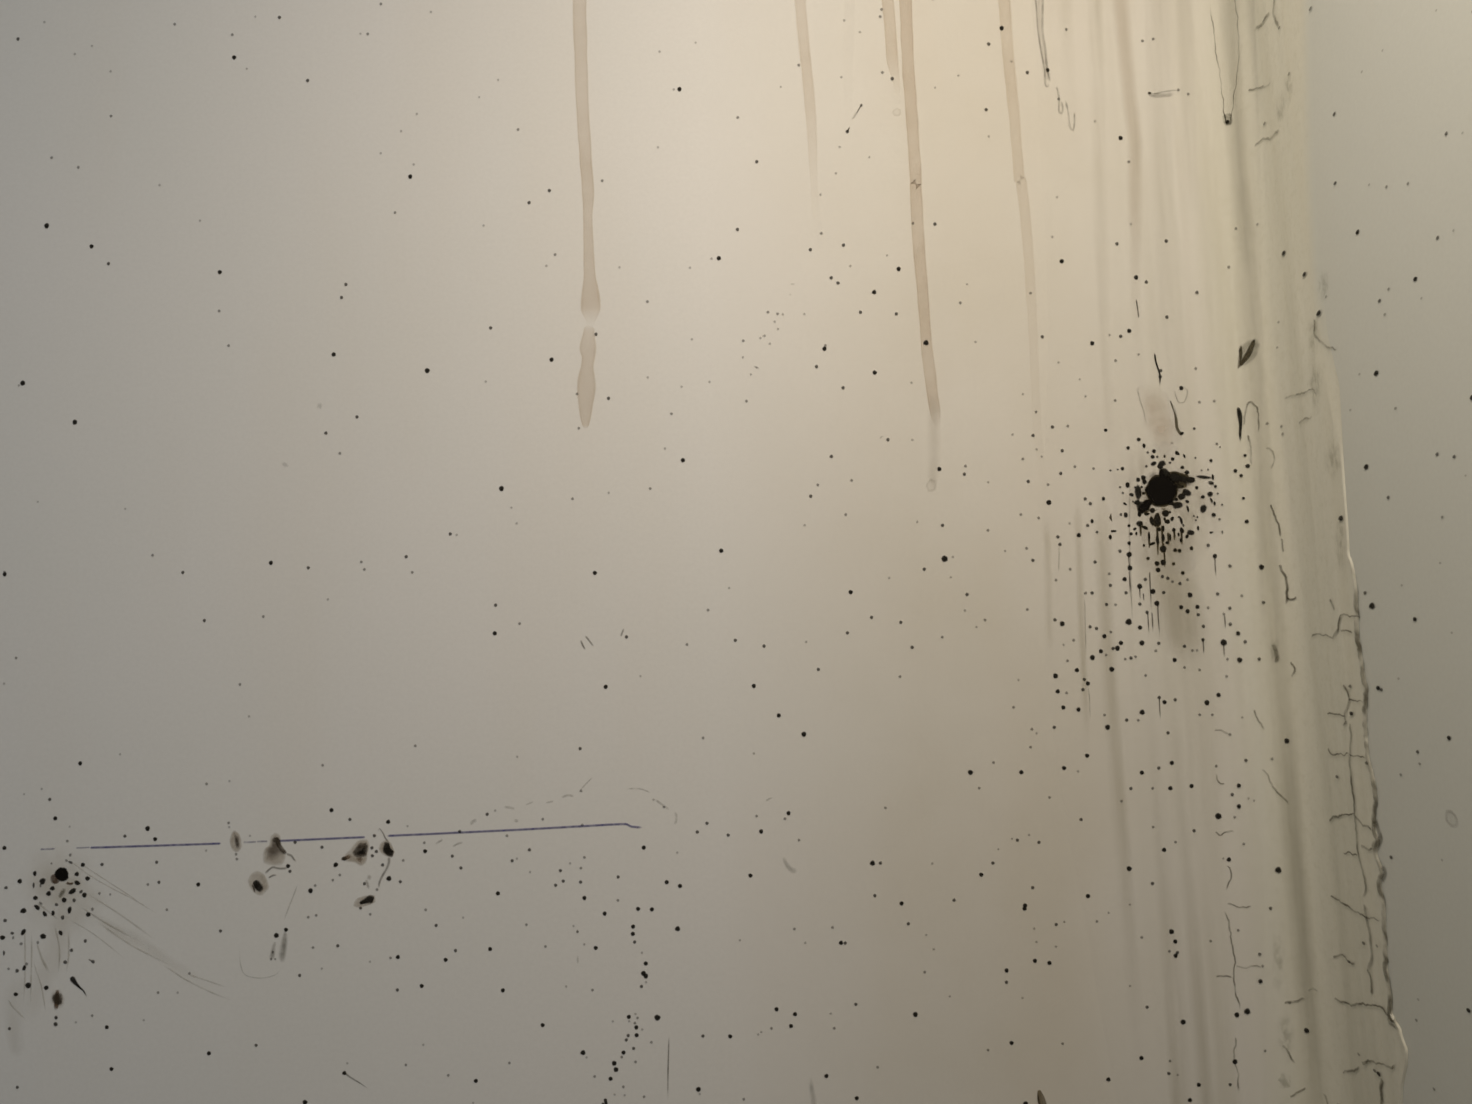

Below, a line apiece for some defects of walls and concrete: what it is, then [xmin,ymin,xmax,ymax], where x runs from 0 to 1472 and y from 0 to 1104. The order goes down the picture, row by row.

damp [1053,427,1261,711]
peeling [1169,0,1408,1104]
crack [1275,572,1395,1028]
crack [1347,1060,1393,1102]